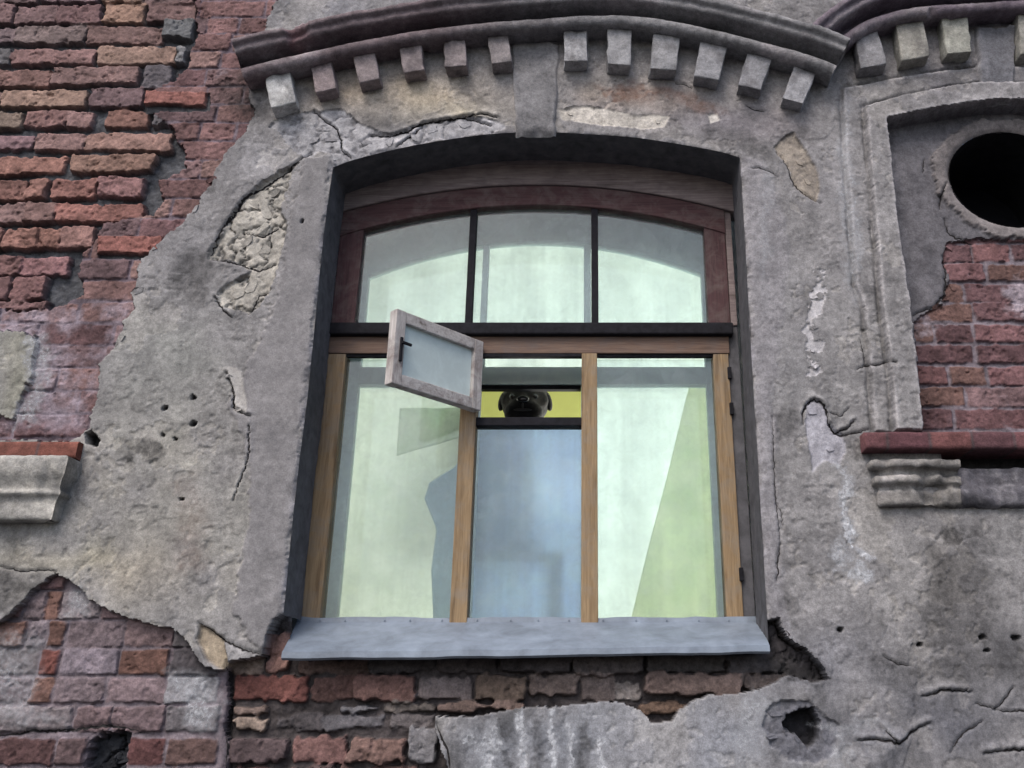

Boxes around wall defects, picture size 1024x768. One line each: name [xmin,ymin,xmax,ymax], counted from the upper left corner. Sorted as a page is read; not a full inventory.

crack [371,113,497,143]
flaking render [774,131,821,202]
flaking render [0,0,278,447]
flaking render [914,237,1024,432]
crack [226,373,250,487]
crack [772,419,783,579]
flaking render [0,573,829,768]
flaking render [762,699,841,763]
crack [857,724,927,745]
crack [926,688,1024,752]
crack [984,747,1024,755]